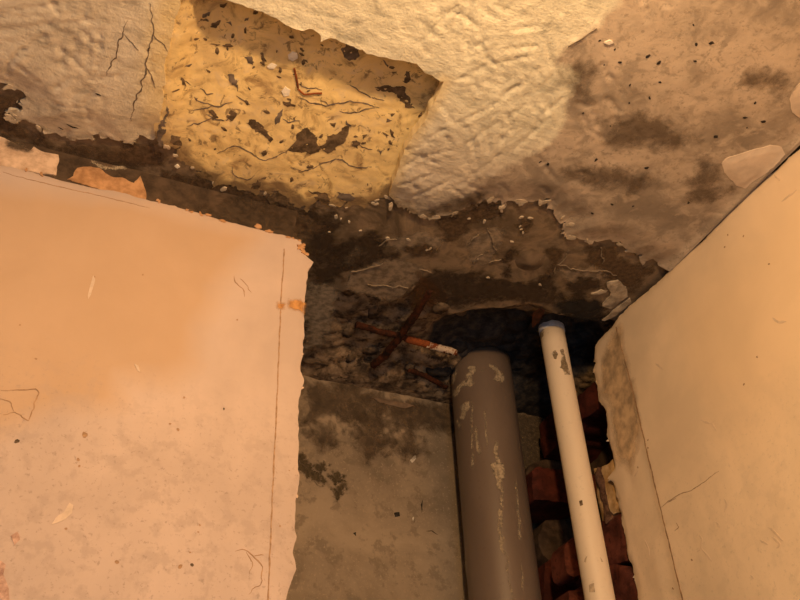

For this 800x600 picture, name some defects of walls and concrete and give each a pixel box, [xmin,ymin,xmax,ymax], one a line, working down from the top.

crack [106,4,167,121]
flaking render [154,0,440,213]
damp [566,167,646,190]
damp [608,113,681,146]
damp [690,162,717,200]
damp [745,73,777,85]
crack [1,388,39,421]
damp [298,382,454,501]
spalling [300,280,631,418]
damp [603,331,638,463]
crack [616,327,719,600]